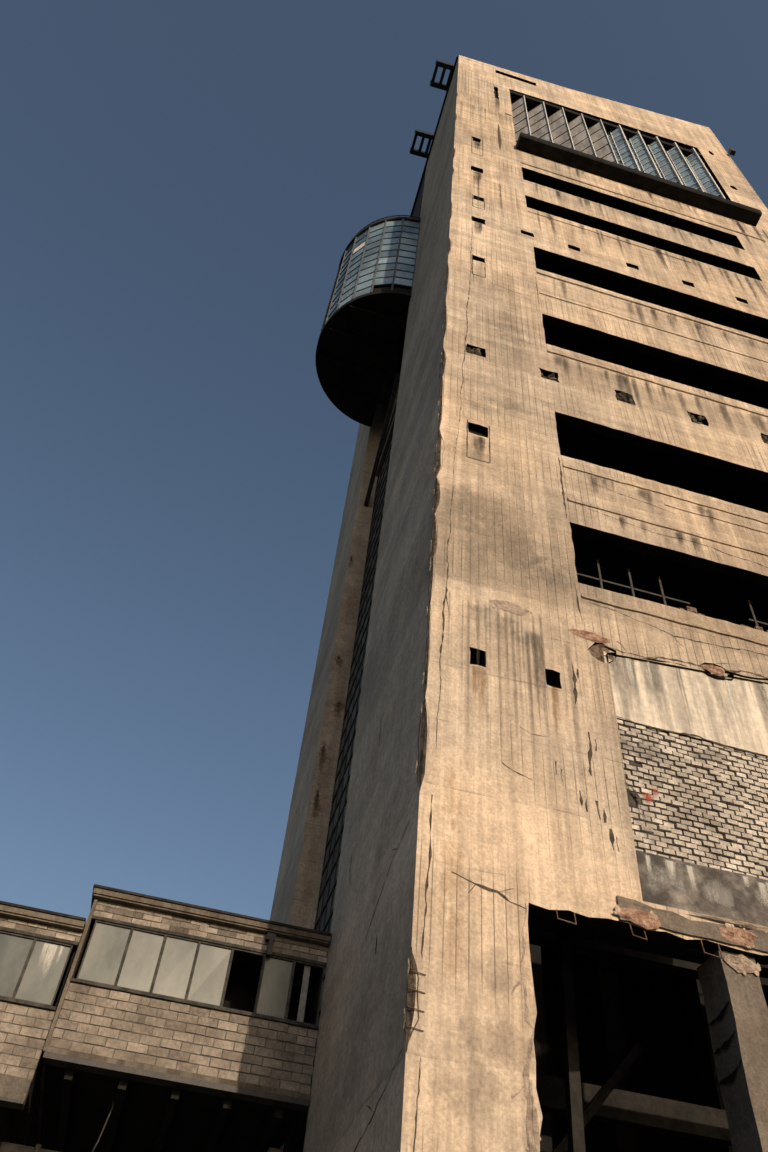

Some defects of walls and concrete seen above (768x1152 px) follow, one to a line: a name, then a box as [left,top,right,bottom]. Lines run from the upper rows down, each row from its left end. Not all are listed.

crack [435,224,660,750]
peeling [571,662,579,704]
spalling [568,629,768,678]
crack [361,795,526,959]
water stain [661,860,694,881]
spalling [613,905,661,930]
spalling [689,912,768,976]
spalling [403,952,426,1048]
crack [354,1046,421,1152]